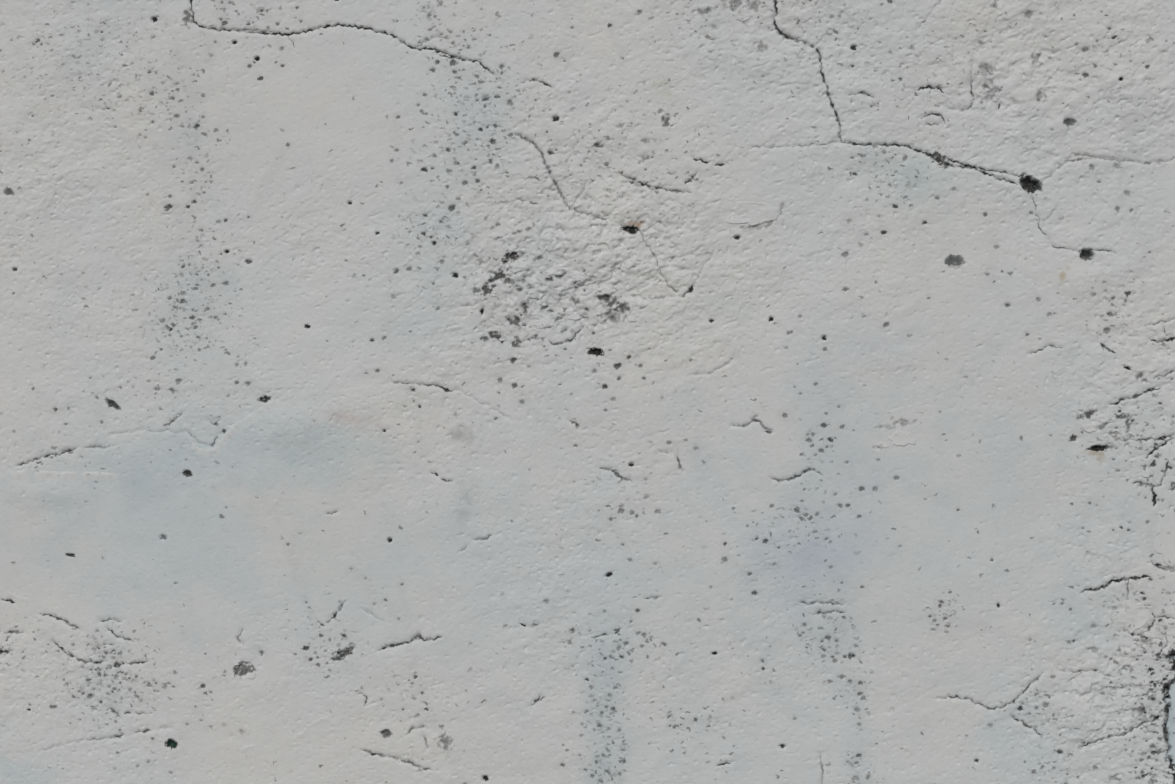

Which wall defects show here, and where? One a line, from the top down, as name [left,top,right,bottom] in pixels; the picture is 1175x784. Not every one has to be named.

crack [190,0,490,71]
crack [774,0,1064,248]
peeling [1117,592,1175,784]